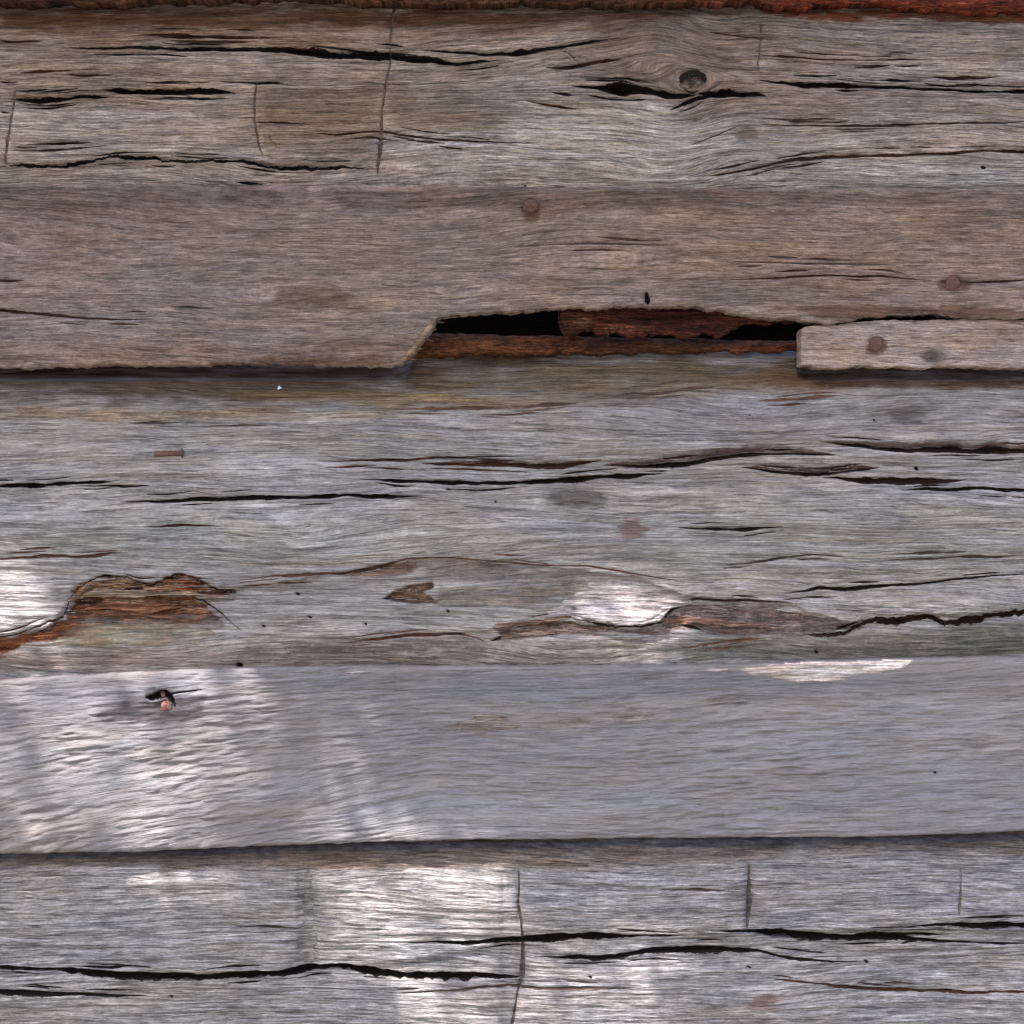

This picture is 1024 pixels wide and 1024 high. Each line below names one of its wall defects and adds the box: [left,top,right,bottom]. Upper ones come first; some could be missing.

crack [1,28,1024,185]
spalling [401,315,461,362]
crack [0,436,1024,528]
spalling [53,588,234,649]
crack [0,547,1024,652]
spalling [420,561,1024,640]
rust [100,696,203,720]
crack [0,915,1024,998]